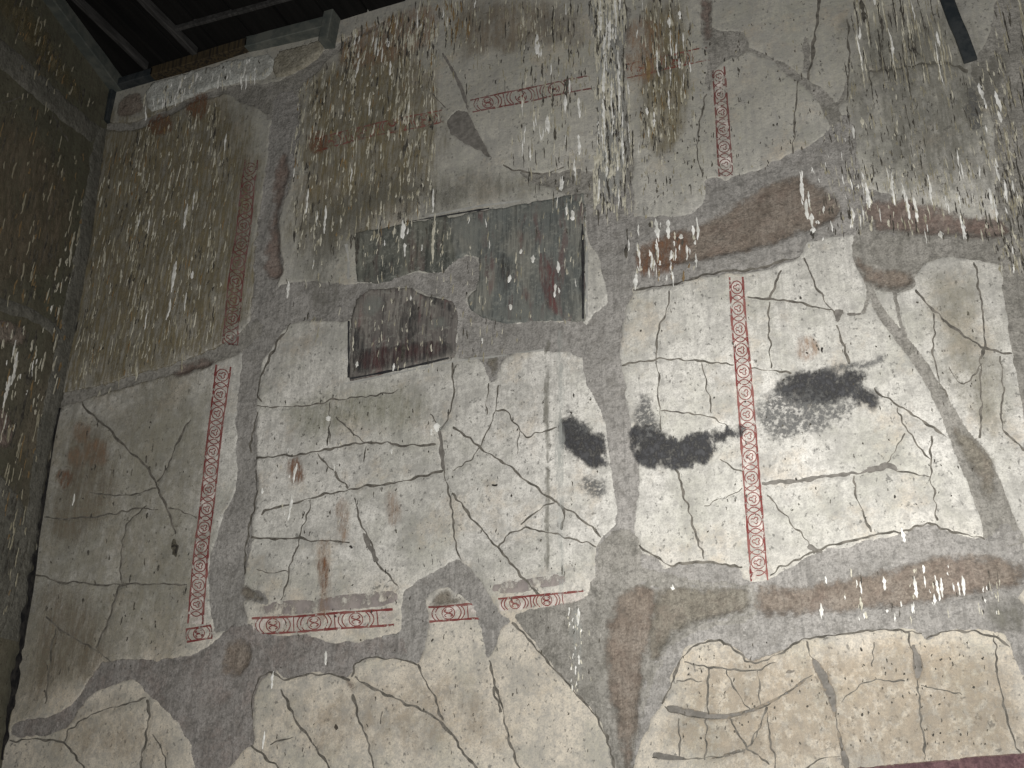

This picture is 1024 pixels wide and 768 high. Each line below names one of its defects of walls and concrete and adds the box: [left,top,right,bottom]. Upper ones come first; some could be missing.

damp [0,0,269,615]
damp [288,0,721,375]
crack [622,256,850,430]
spalling [858,259,912,288]
damp [800,0,1024,275]
damp [276,448,310,536]
crack [244,323,601,600]
crack [639,387,985,576]
spalling [954,430,994,494]
spalling [434,591,458,606]
spalling [606,555,1023,766]
crack [652,628,1022,768]